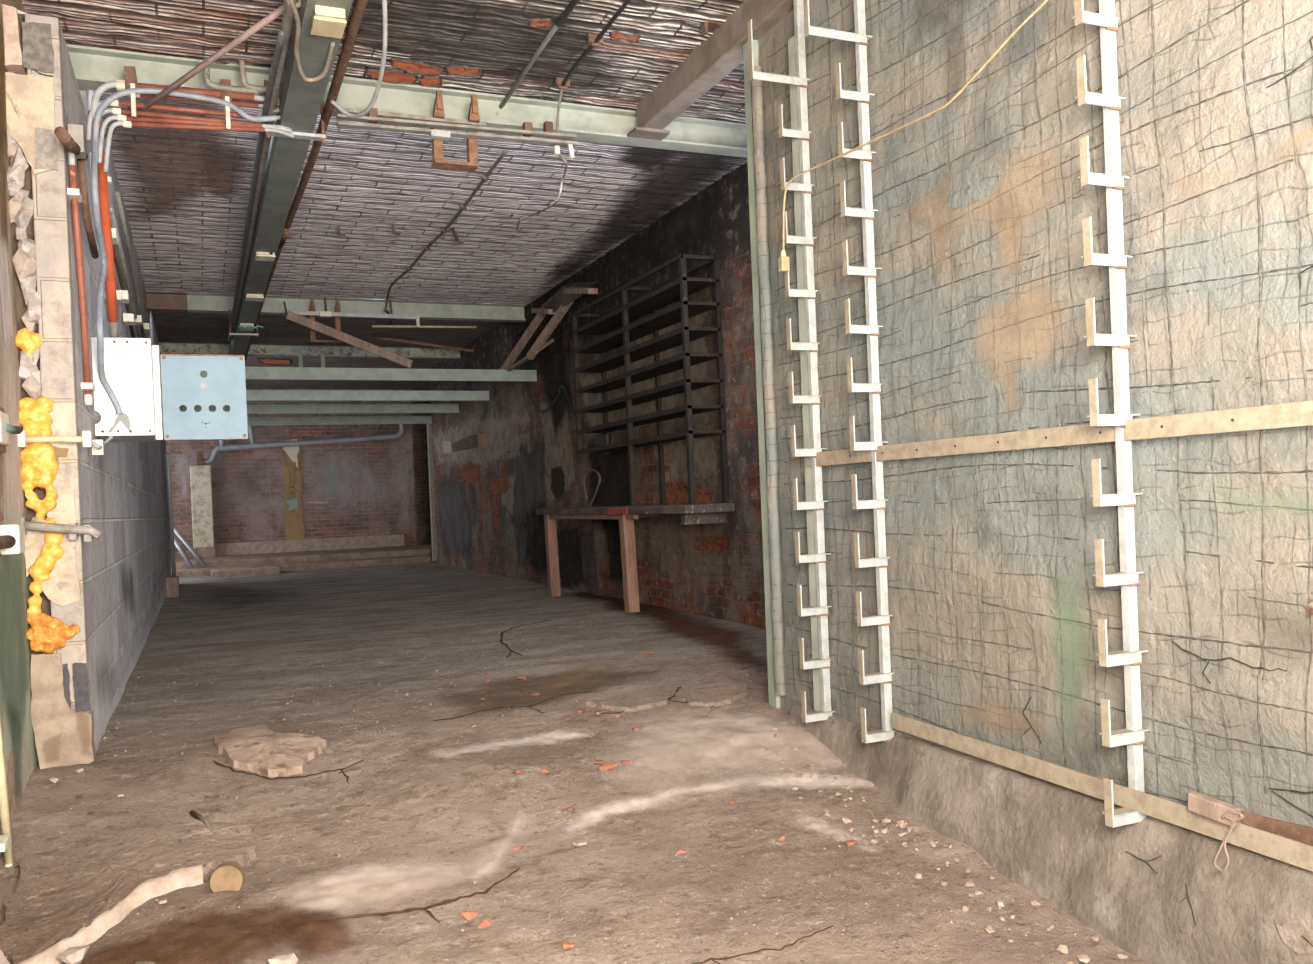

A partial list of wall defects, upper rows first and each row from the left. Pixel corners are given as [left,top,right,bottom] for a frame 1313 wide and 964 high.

crack [1266,36,1313,88]
damp [0,31,8,152]
damp [0,169,12,345]
crack [1172,641,1286,684]
damp [569,715,874,829]
crack [1268,788,1313,818]
damp [77,863,491,964]
crack [334,867,520,923]
crack [693,926,834,964]